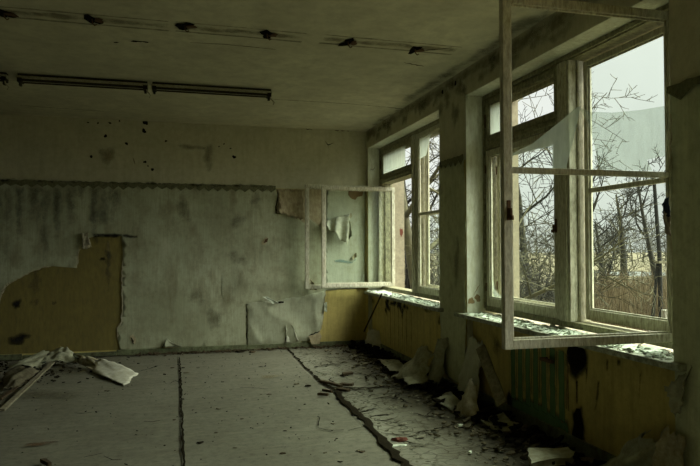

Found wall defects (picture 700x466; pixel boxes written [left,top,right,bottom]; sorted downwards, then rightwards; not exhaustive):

peeling [275,189,352,244]
peeling [0,232,123,354]
crack [277,346,530,466]
leakage [507,346,588,441]